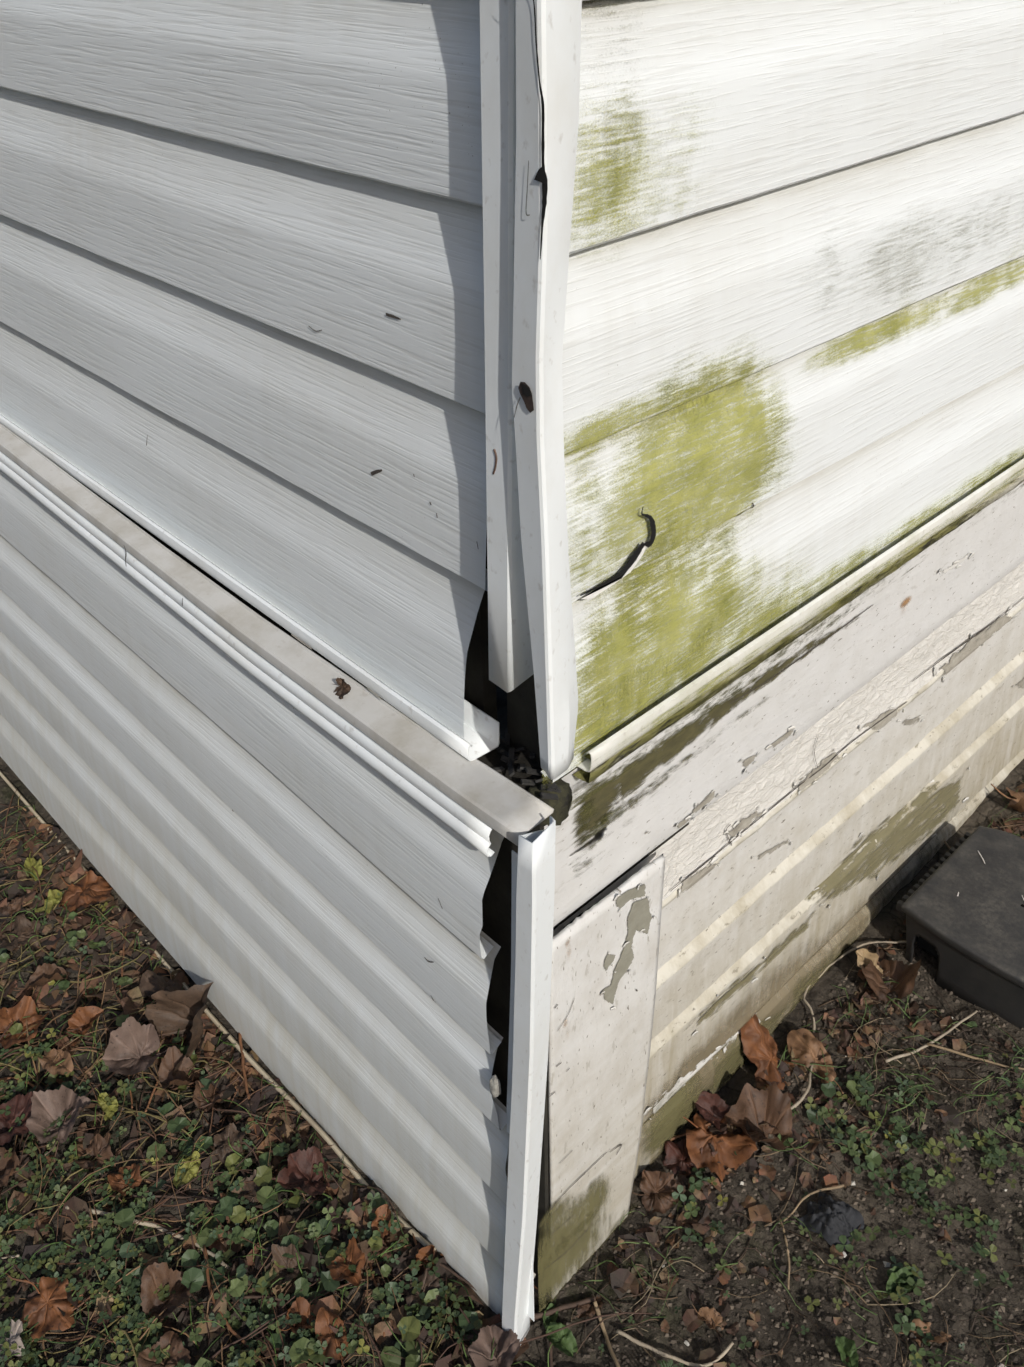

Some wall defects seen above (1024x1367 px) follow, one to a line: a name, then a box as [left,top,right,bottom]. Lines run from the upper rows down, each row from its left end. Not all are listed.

crack [526,0,548,260]
peeling [934,606,1020,682]
peeling [859,706,925,732]
peeling [739,726,798,774]
peeling [793,748,848,795]
peeling [675,790,720,829]
peeling [677,856,722,898]
peeling [600,883,655,1010]